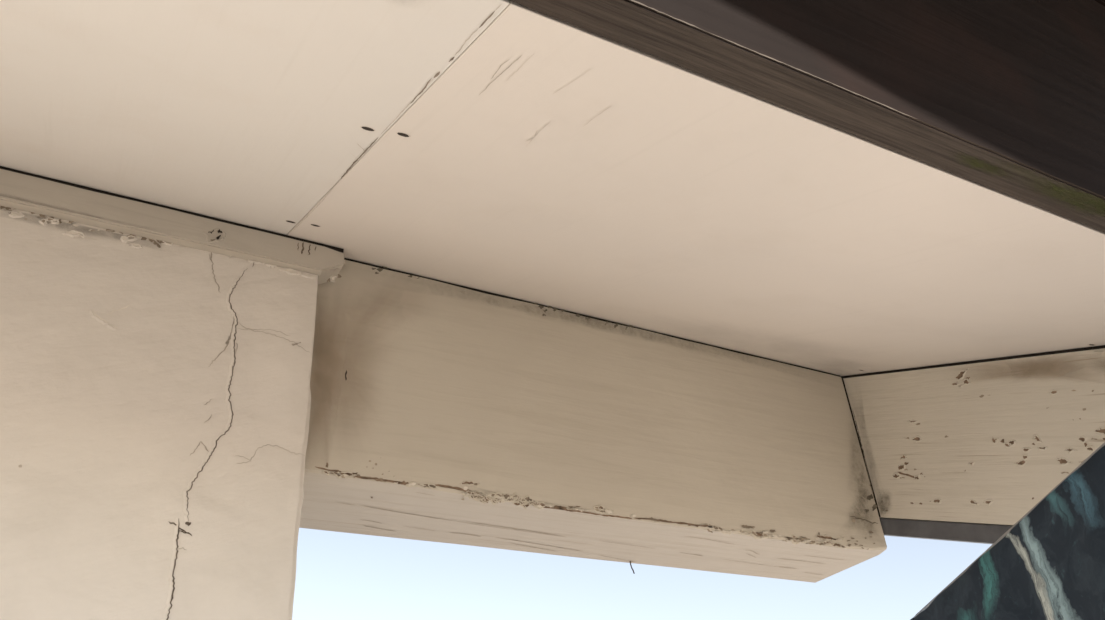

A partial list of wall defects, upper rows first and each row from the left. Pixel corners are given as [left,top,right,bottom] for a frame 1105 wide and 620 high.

peeling [0,206,187,249]
peeling [951,368,971,388]
crack [163,252,309,620]
peeling [892,454,925,481]
peeling [991,427,1105,474]
peeling [316,460,875,550]